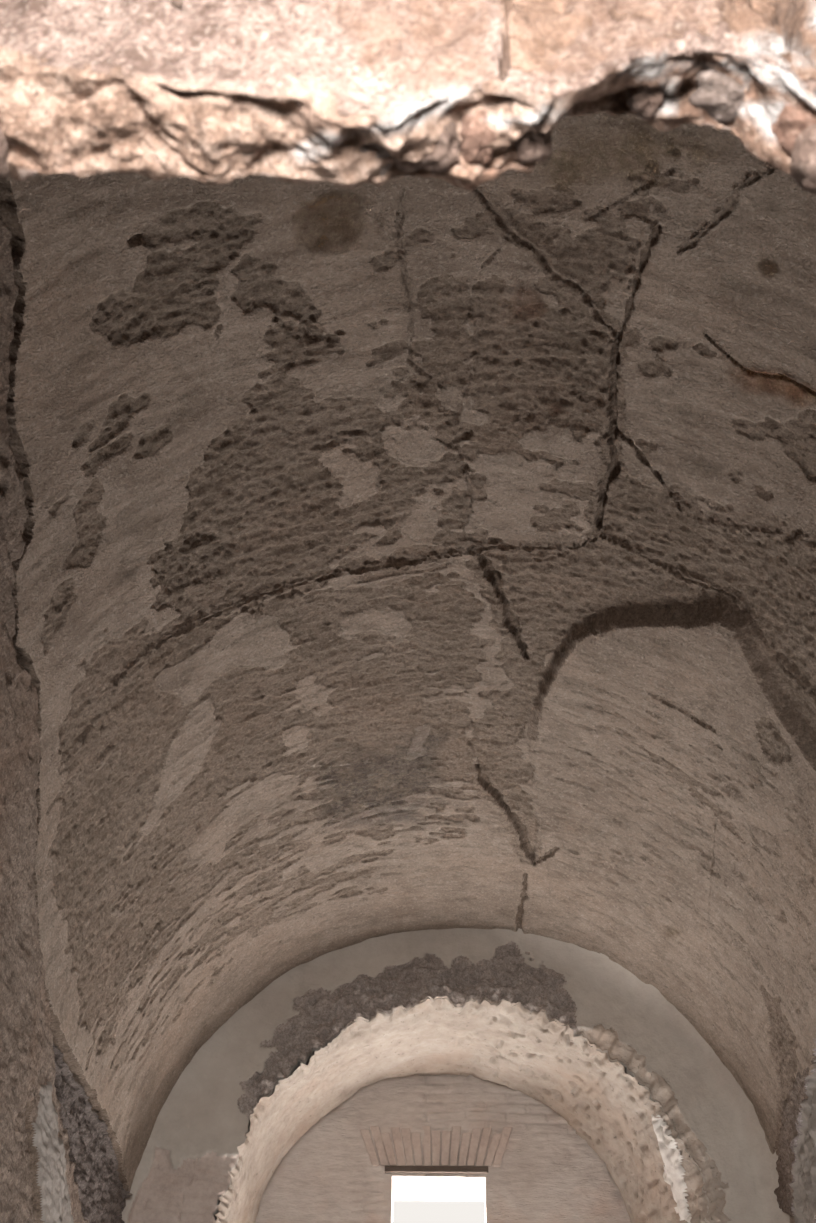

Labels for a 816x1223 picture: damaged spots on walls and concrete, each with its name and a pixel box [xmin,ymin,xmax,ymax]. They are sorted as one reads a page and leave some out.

spalling [0,0,816,191]
crack [498,0,514,82]
crack [114,167,816,703]
crack [0,178,42,949]
flaking render [40,159,816,1070]
crack [648,693,718,734]
crack [469,761,559,932]
crack [44,980,129,1191]
spalling [237,941,732,1223]
spalling [760,984,816,1218]